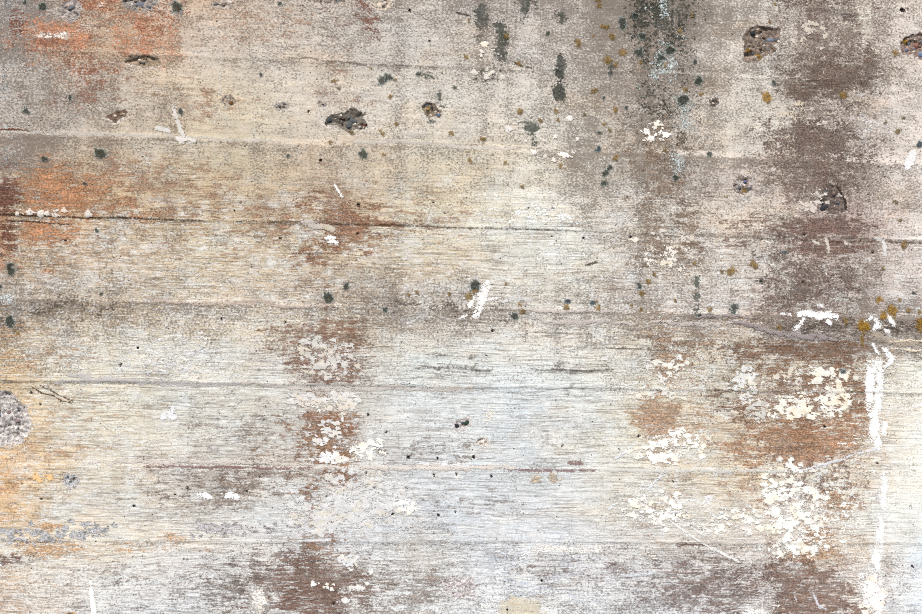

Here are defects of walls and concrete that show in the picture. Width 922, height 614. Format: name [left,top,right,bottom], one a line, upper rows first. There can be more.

corrosion [0,0,262,129]
corrosion [0,151,476,297]
corrosion [212,0,314,51]
spalling [316,101,368,134]
water stain [605,0,728,371]
spalling [740,16,831,65]
water stain [740,0,921,347]
water stain [121,400,506,547]
peeling [259,335,442,541]
water stain [511,494,789,614]
peeling [620,457,866,559]
peeling [725,362,865,422]